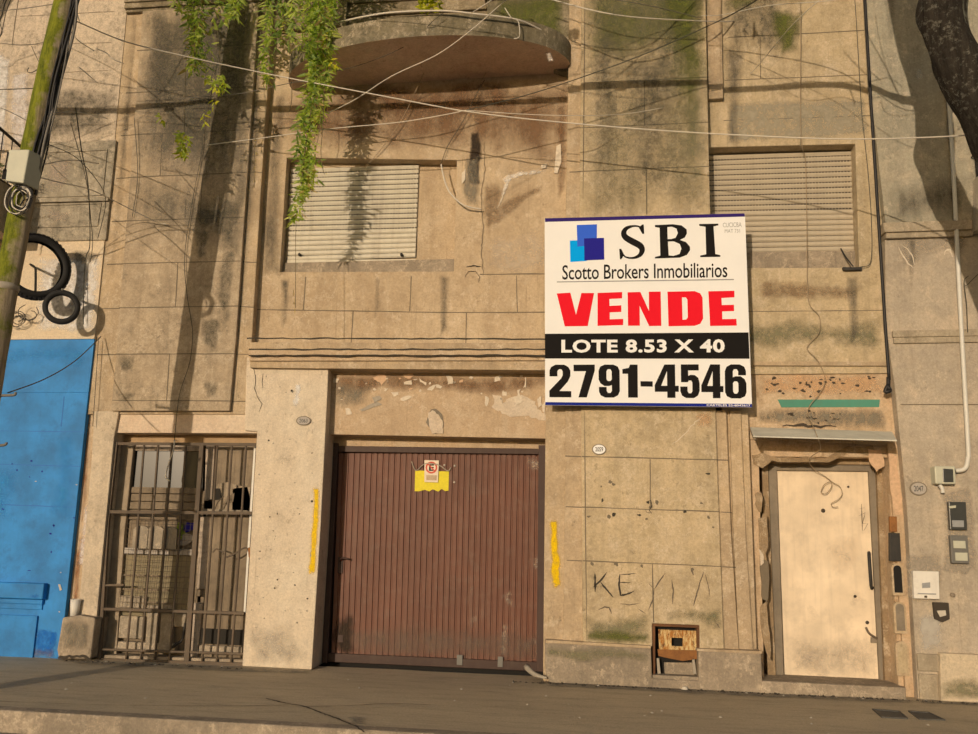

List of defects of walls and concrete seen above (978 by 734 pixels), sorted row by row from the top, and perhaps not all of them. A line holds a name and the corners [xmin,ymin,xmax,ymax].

leakage [733,0,798,50]
leakage [150,11,246,161]
leakage [607,0,700,189]
leakage [299,85,564,224]
spalling [426,409,444,434]
peeling [333,373,546,421]
peeling [765,376,875,397]